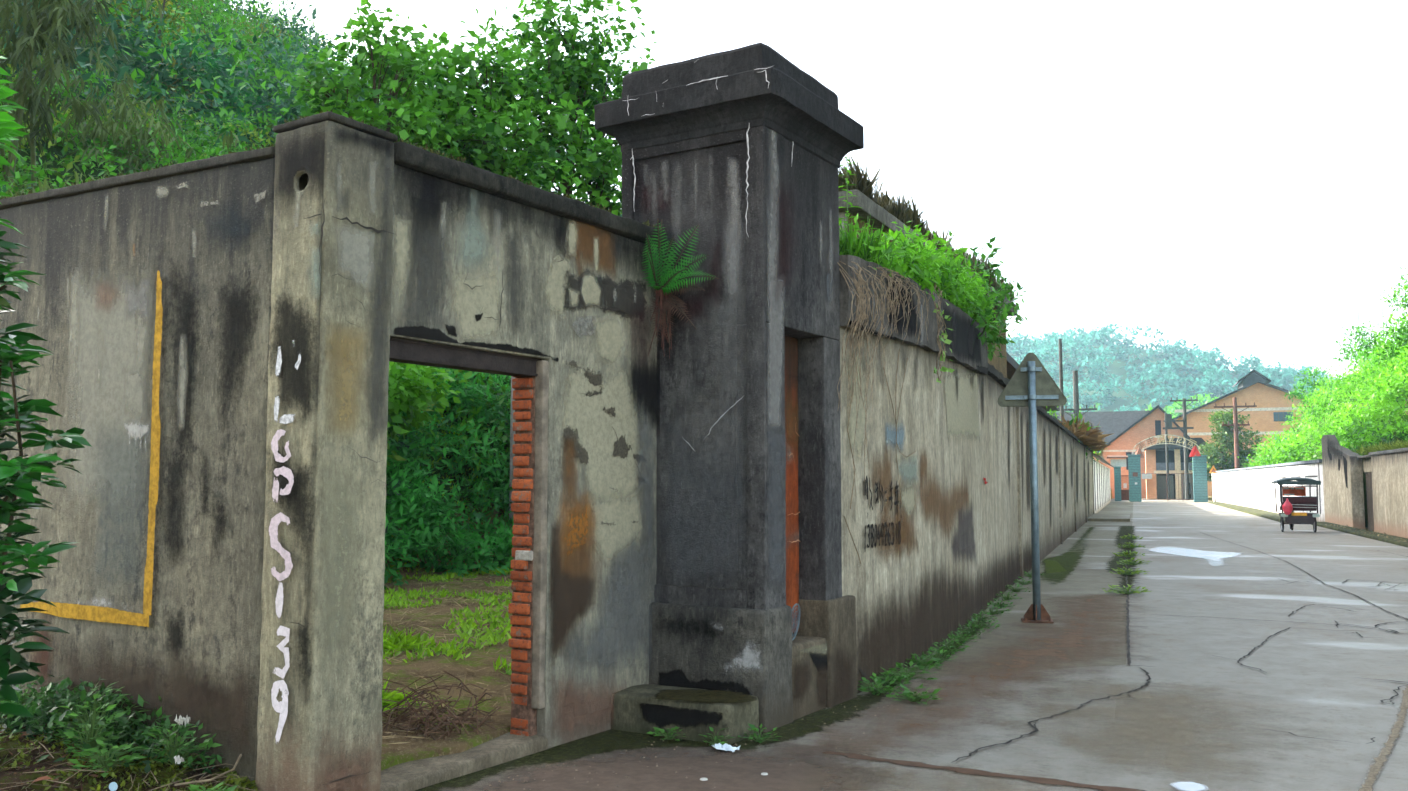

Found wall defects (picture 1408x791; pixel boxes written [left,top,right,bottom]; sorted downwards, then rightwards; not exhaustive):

damp [160,270,199,562]
damp [218,227,322,423]
damp [273,131,444,437]
peeling [394,256,647,560]
damp [944,306,984,437]
damp [271,449,311,546]
corrosion [551,441,595,633]
damp [873,455,976,559]
damp [795,550,1032,703]
crack [1212,578,1406,672]
crack [951,667,1151,763]
crack [1265,684,1408,744]